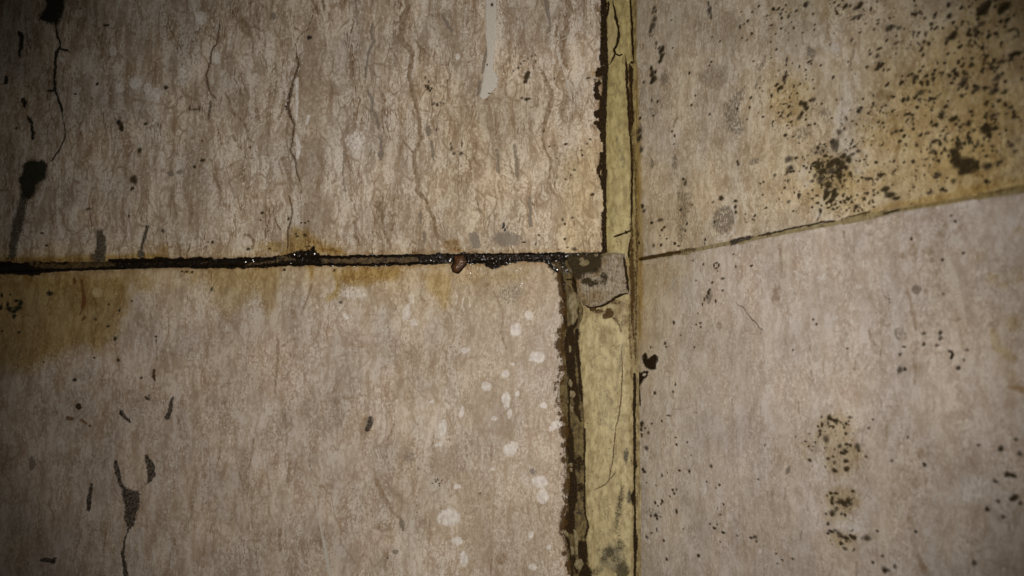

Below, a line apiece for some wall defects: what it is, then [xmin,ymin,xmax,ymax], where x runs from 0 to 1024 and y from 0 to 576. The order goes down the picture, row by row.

crack [3,25,70,162]
crack [274,46,302,250]
damp [712,0,1024,236]
damp [0,0,690,576]
spalling [567,252,630,325]
damp [795,413,879,551]